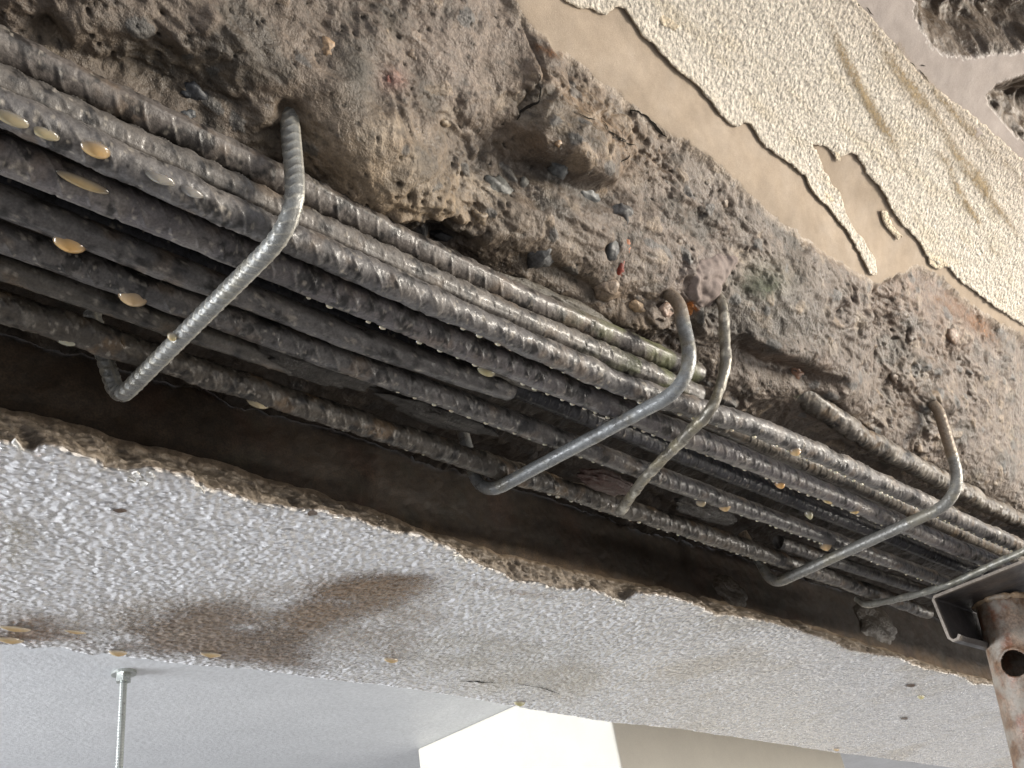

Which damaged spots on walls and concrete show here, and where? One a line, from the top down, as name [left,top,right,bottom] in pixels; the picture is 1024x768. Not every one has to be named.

spalling [0,0,1024,600]
leakage [0,574,440,670]
flaking render [0,407,1024,768]